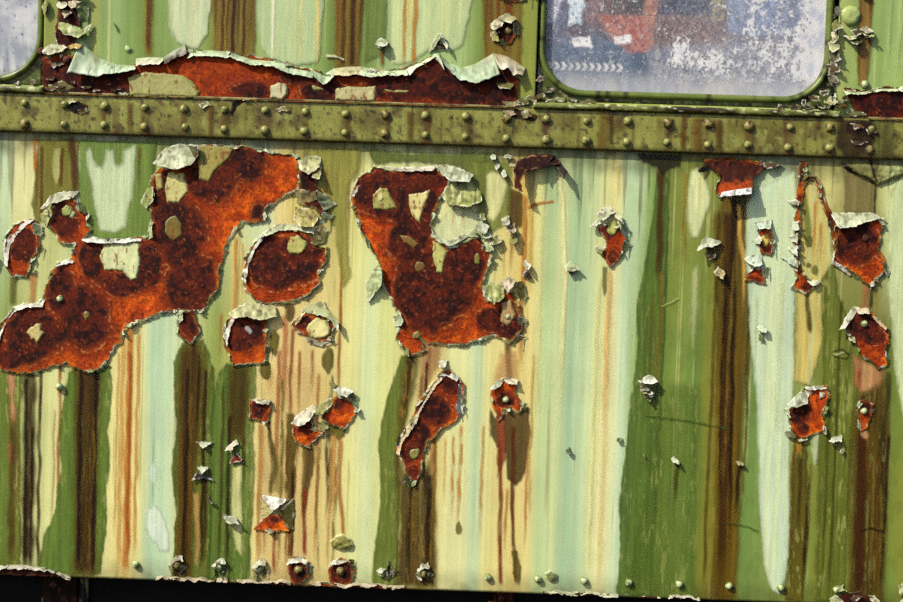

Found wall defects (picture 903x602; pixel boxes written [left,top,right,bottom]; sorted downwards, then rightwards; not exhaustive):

peeling [30,31,526,96]
peeling [516,76,595,105]
peeling [777,0,903,110]
peeling [469,213,520,252]
rust [0,0,553,588]
rust [639,115,782,597]